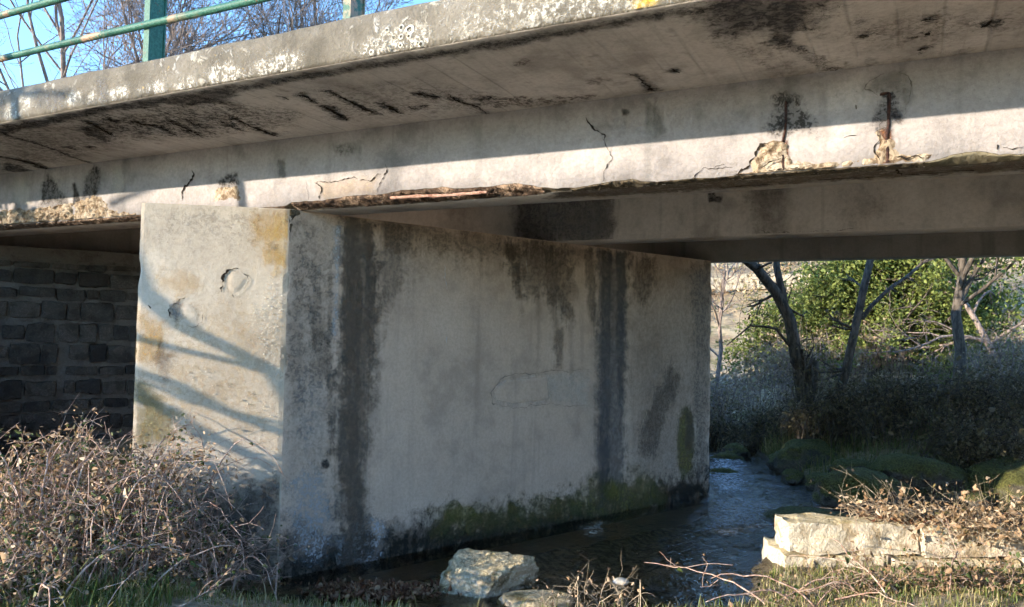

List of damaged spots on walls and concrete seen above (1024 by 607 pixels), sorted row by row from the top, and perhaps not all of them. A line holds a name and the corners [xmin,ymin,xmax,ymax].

leakage [0,0,837,134]
crack [582,118,613,181]
corrosion [768,93,816,163]
spalling [570,92,1024,202]
corrosion [865,72,912,139]
spalling [0,195,141,231]
spalling [213,173,241,202]
crack [306,167,387,200]
spalling [264,183,546,232]
leakage [189,160,1024,588]